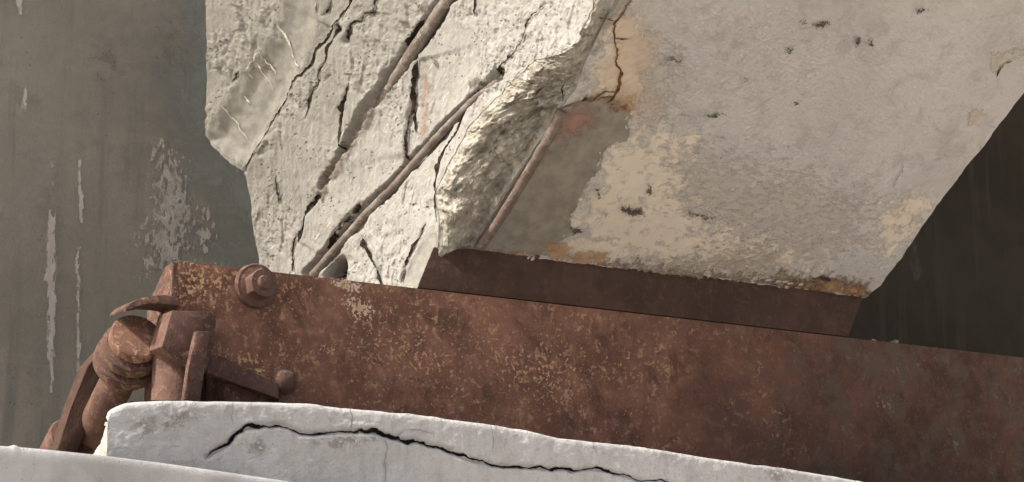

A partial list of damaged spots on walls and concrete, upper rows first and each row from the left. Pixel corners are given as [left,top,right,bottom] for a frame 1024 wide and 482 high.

crack [205,0,631,288]
spalling [309,0,633,287]
spalling [620,205,645,218]
corrosion [546,243,871,298]
peeling [629,239,808,290]
crack [208,402,667,482]